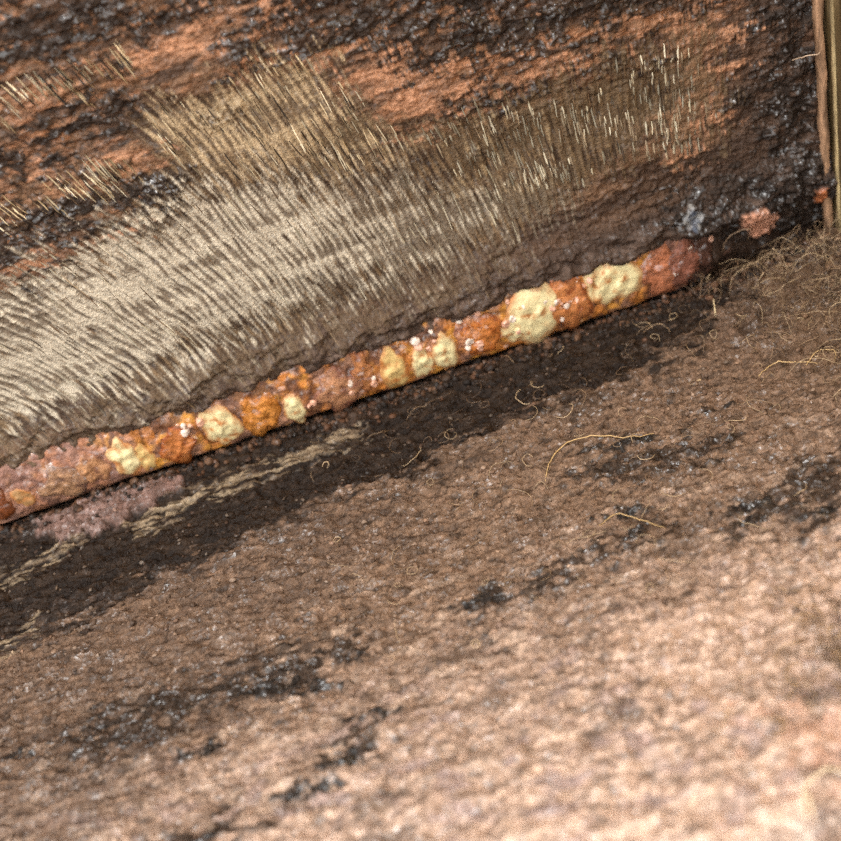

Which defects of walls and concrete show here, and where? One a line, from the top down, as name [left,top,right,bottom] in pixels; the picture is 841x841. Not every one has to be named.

water stain [0,162,197,292]
peeling [0,2,747,469]
water stain [0,281,762,841]
rust [0,204,814,524]
water stain [0,0,841,252]
water stain [439,400,841,841]